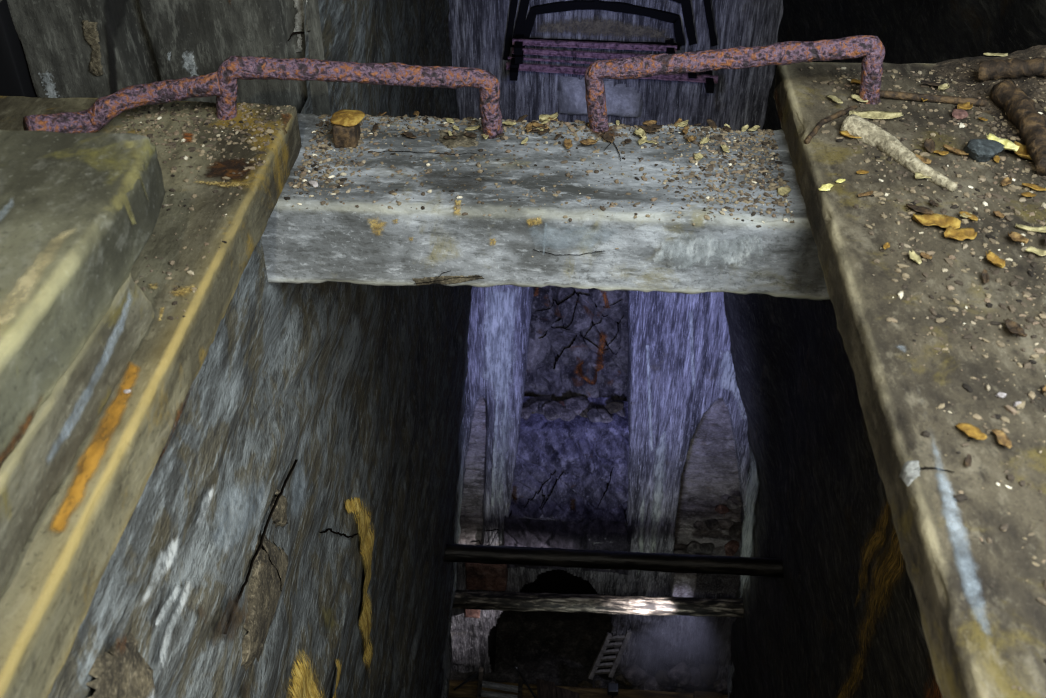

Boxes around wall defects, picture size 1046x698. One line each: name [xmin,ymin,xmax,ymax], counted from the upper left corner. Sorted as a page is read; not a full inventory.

corrosion [23,56,503,139]
corrosion [584,35,885,136]
crack [536,290,624,369]
crack [224,459,298,634]
crack [319,528,361,538]
leakage [345,497,375,668]
leakage [288,652,342,698]